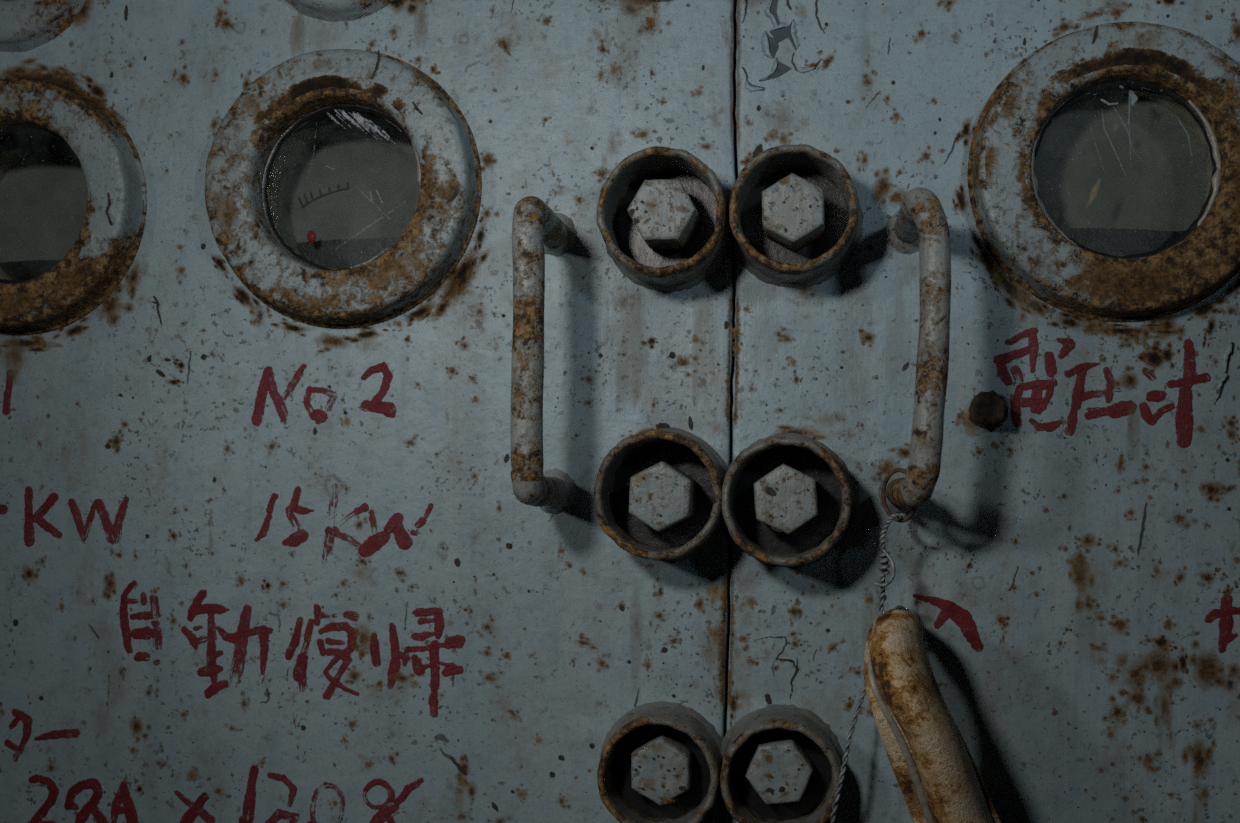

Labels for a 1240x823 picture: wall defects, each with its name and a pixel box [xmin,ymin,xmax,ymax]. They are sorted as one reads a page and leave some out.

rust [0,44,128,135]
rust [240,72,406,127]
peeling [742,0,822,111]
rust [1053,0,1184,37]
rust [1048,8,1240,106]
rust [1052,524,1240,818]